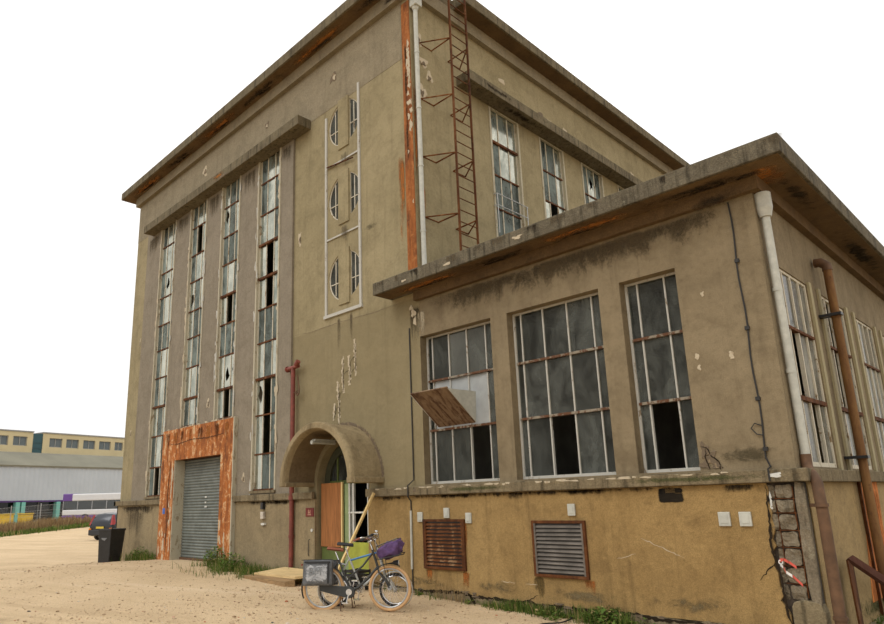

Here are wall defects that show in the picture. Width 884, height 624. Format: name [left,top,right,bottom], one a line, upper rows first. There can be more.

flaking render [406,33,433,131]
corrosion [399,0,425,270]
water stain [395,254,455,291]
water stain [451,167,807,302]
corrosion [167,422,229,445]